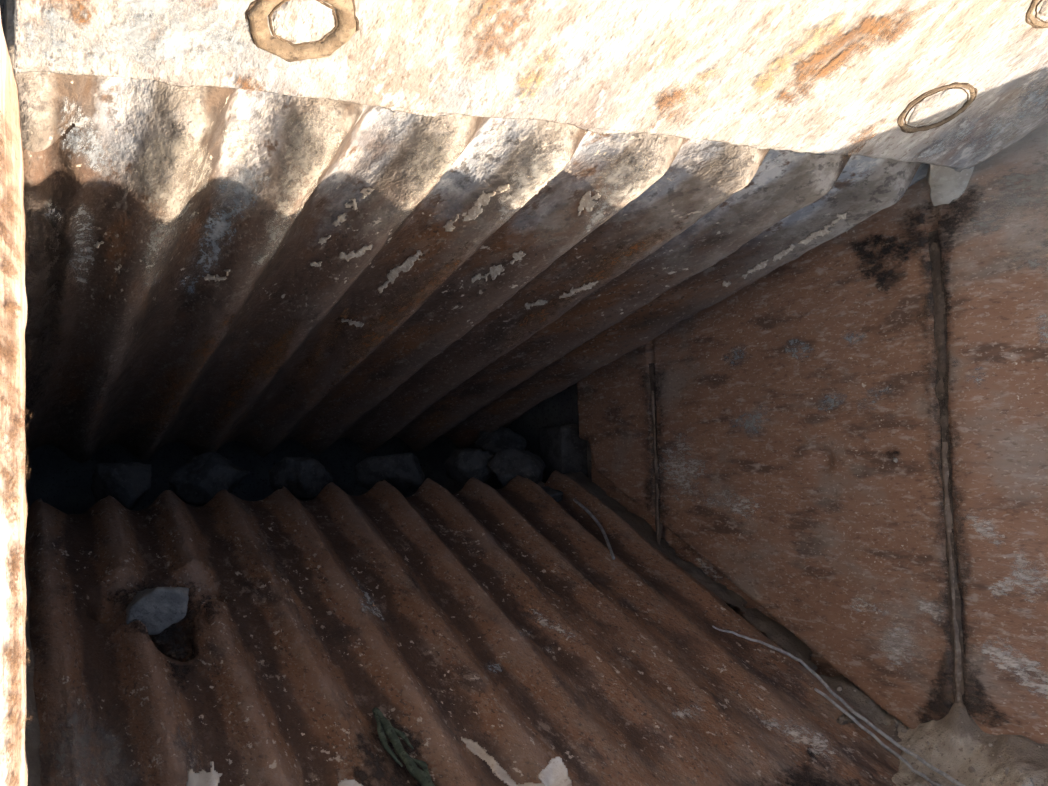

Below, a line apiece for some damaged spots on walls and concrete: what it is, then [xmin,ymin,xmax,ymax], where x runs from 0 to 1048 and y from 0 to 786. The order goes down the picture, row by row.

corrosion [56,0,95,25]
corrosion [755,11,917,107]
corrosion [230,75,262,96]
corrosion [652,85,703,128]
peeling [318,187,374,245]
peeling [443,184,510,232]
peeling [578,191,601,216]
peeling [339,244,372,262]
peeling [378,250,422,293]
peeling [472,251,526,283]
water stain [852,240,908,291]
peeling [525,281,598,309]